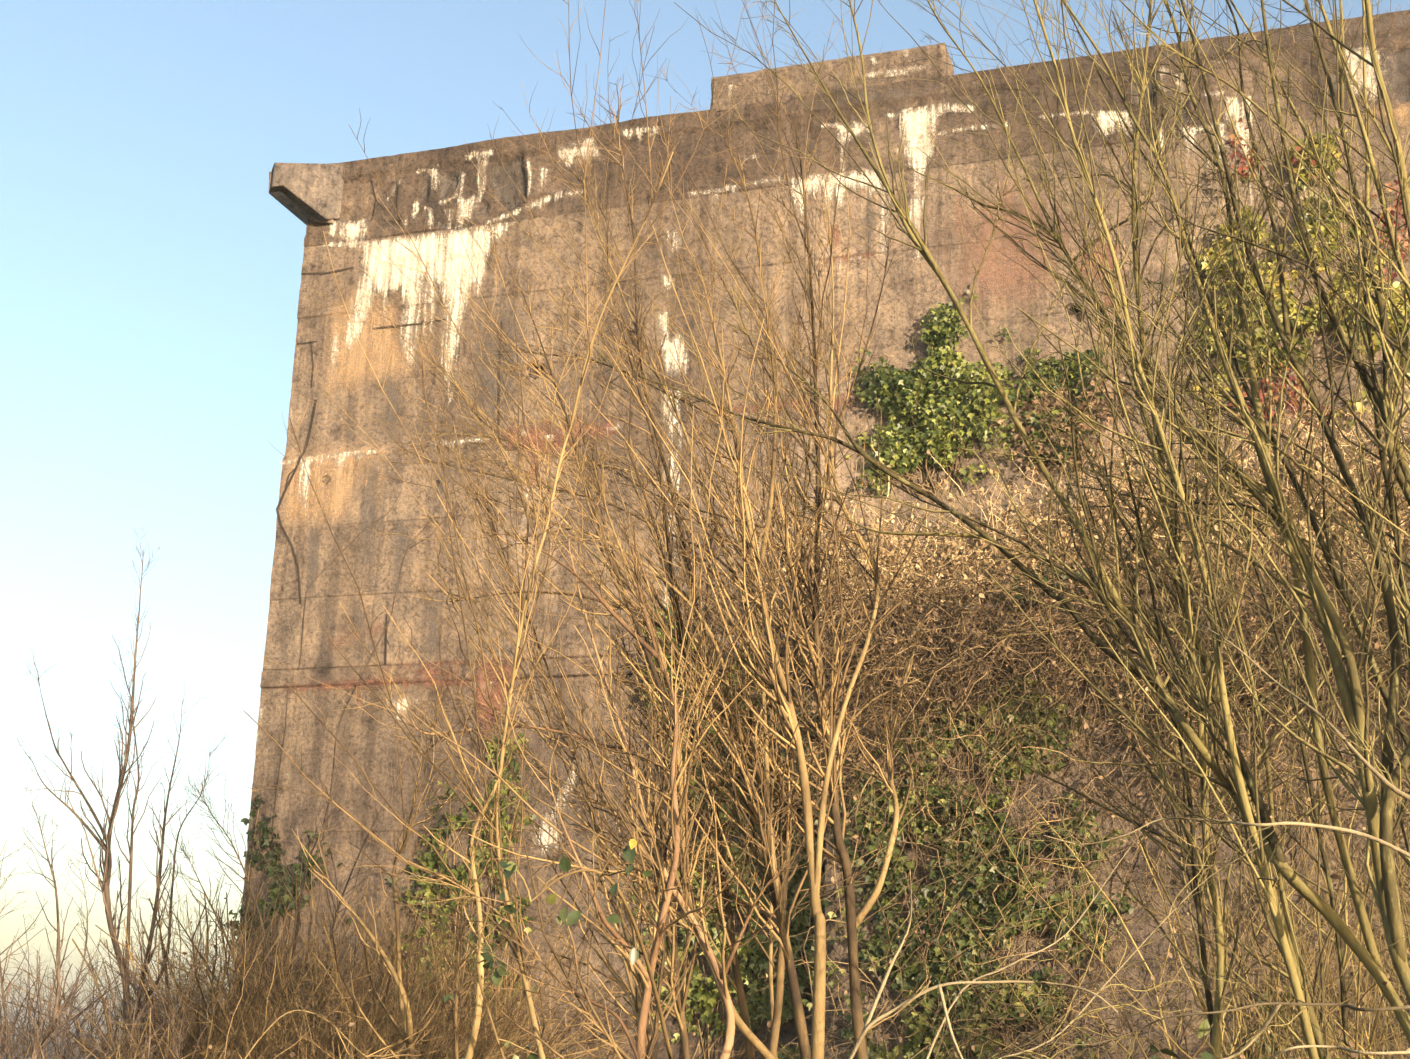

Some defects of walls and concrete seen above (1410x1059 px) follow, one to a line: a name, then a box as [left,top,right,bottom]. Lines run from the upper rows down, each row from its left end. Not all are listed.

damp [1345,50,1394,97]
damp [558,138,598,166]
damp [821,123,869,140]
damp [843,58,987,228]
damp [777,169,886,261]
damp [329,150,582,401]
damp [659,312,687,372]
damp [663,390,681,492]